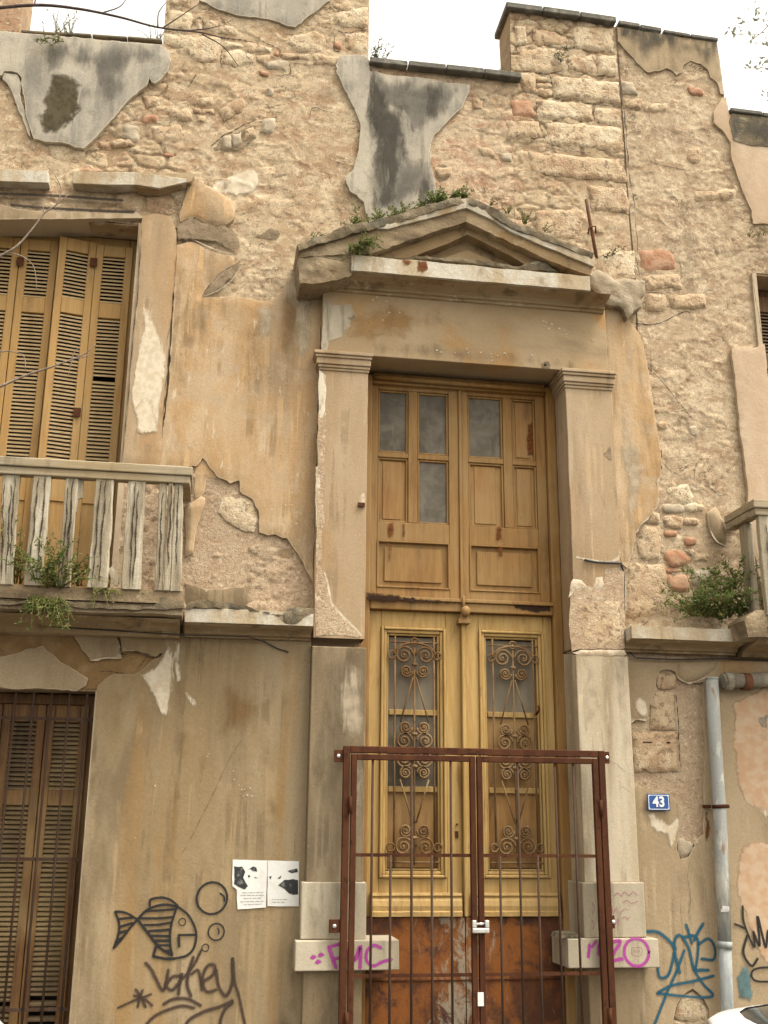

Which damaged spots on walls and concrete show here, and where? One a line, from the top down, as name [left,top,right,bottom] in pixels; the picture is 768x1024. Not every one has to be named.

water stain [49,44,67,63]
water stain [78,50,149,97]
water stain [370,73,450,203]
peeling [0,0,768,661]
peeling [0,634,162,689]
peeling [631,670,704,859]